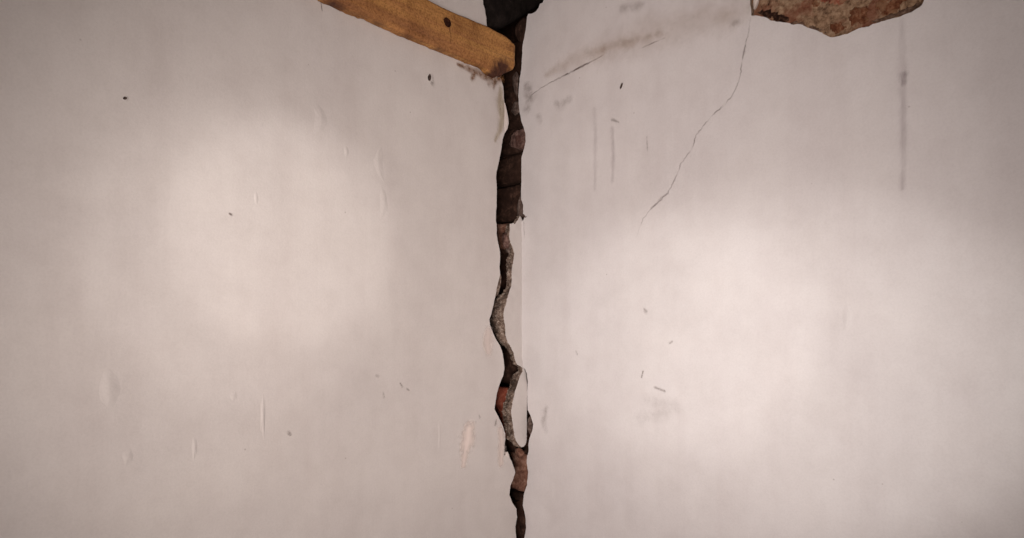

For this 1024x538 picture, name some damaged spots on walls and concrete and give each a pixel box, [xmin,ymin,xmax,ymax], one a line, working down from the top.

crack [515,18,527,45]
spalling [750,0,924,37]
crack [489,72,533,538]